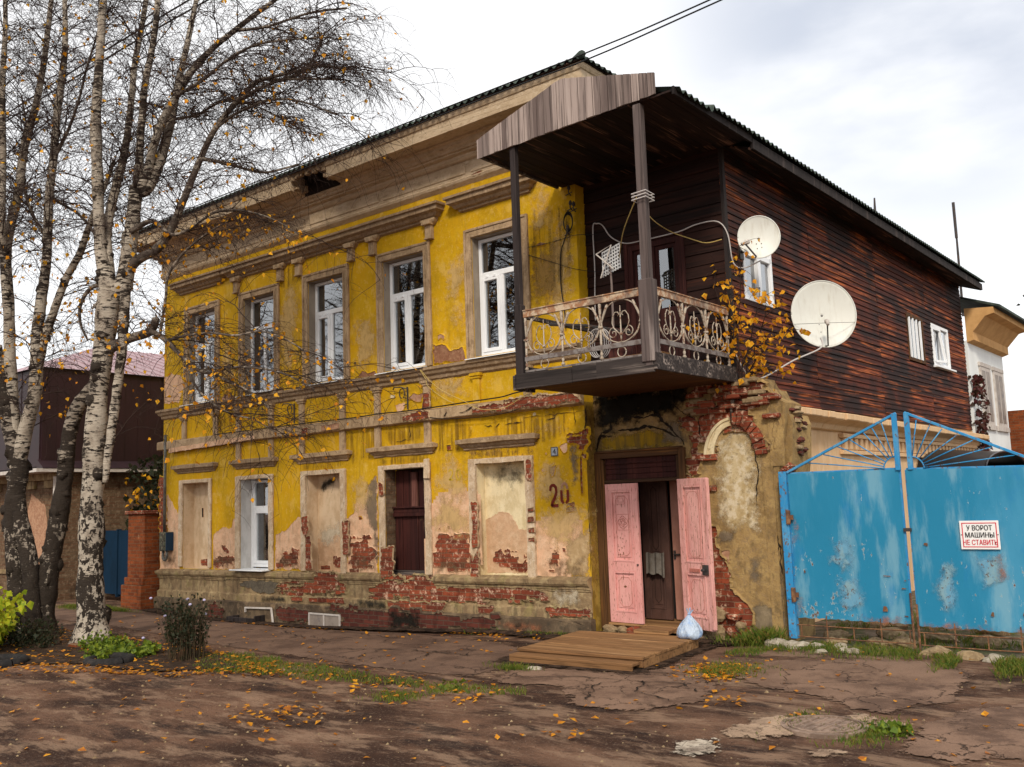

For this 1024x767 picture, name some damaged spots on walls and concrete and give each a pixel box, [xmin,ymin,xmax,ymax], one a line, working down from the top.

spalling [432,333,467,365]
crack [443,395,758,451]
peeling [424,419,675,577]
crack [753,455,761,505]
peeling [318,475,379,573]
peeling [831,540,852,568]
peeling [838,580,863,607]